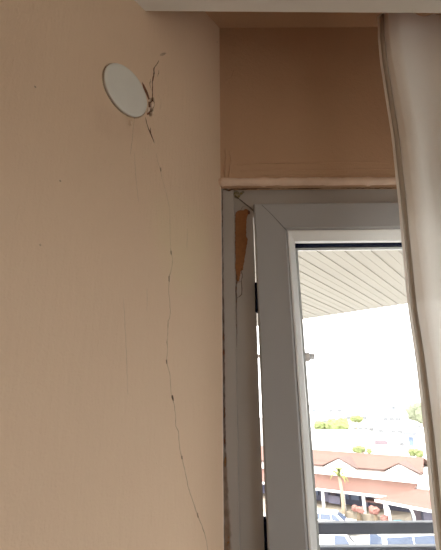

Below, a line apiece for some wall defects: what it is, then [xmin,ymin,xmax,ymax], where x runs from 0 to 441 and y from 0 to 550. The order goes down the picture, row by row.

peeling [235,209,250,328]